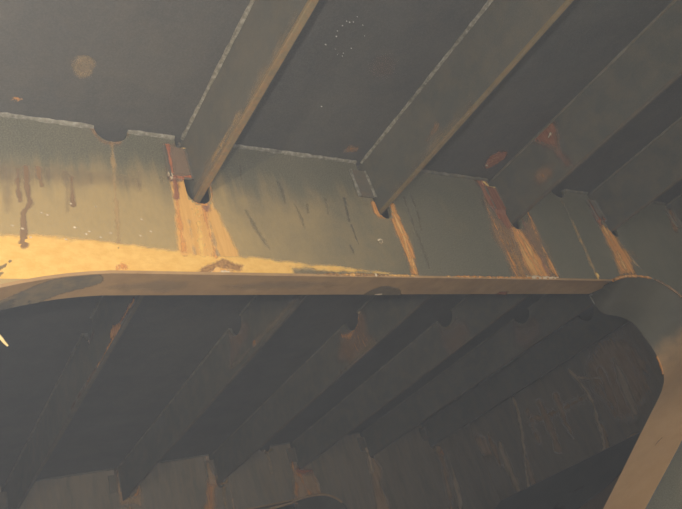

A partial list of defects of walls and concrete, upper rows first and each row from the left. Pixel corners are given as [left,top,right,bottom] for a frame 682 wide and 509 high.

rust [165,144,239,258]
rust [317,203,418,277]
rust [447,180,559,279]
rust [589,202,682,298]